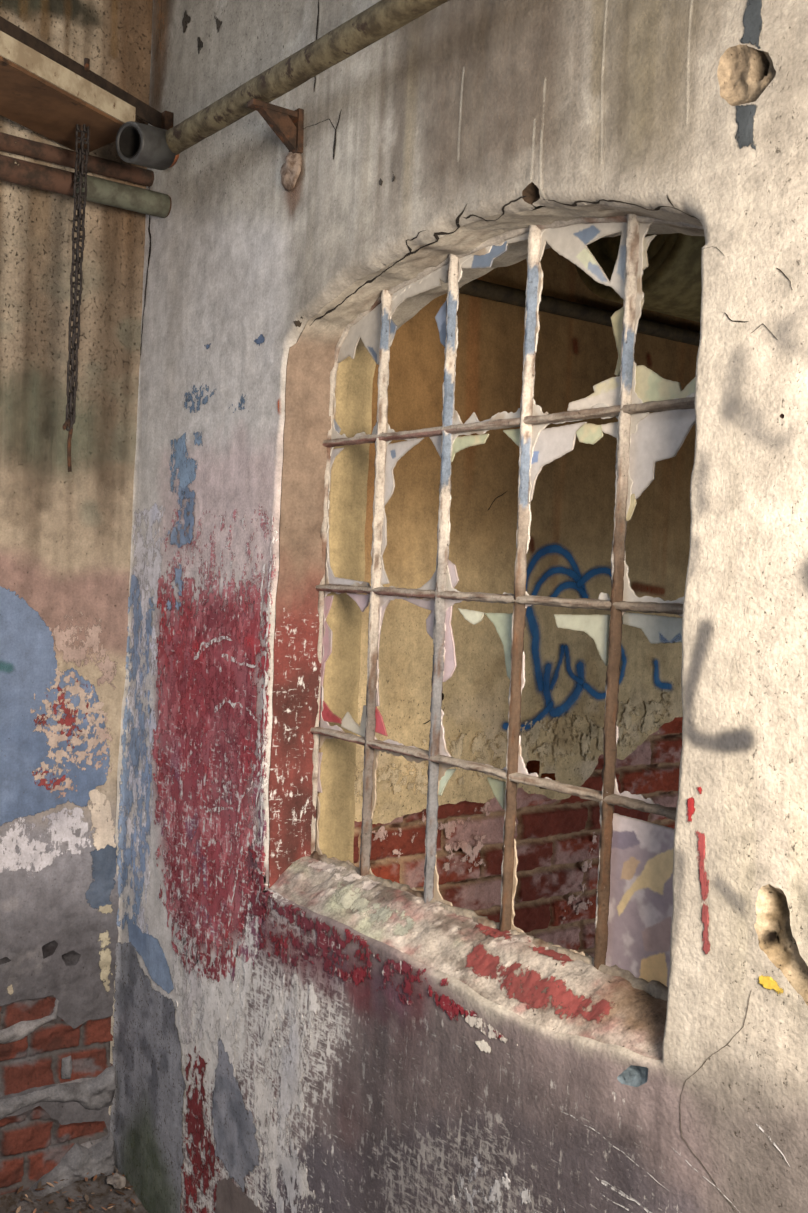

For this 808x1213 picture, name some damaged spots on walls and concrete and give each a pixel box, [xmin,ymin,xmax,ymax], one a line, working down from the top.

spalling [717,44,776,106]
crack [310,196,724,326]
crack [724,312,777,339]
peeling [0,432,518,1213]
flaking render [308,689,683,1023]
spalling [754,884,808,1006]
spalling [617,1065,648,1087]
peeling [448,1154,566,1213]